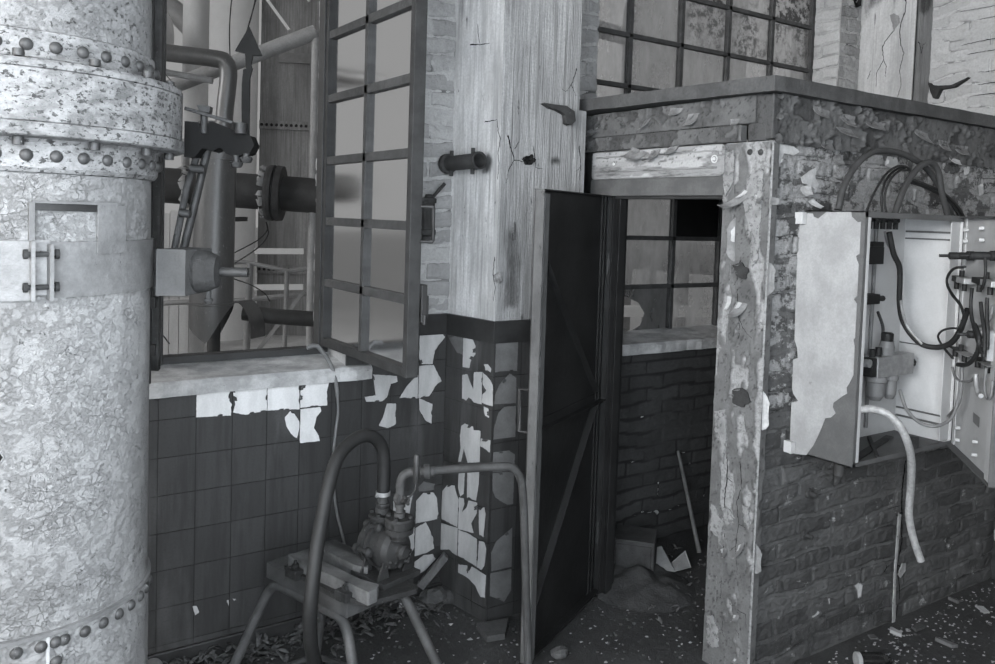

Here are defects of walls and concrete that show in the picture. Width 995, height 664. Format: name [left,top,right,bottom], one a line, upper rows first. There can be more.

crack [867,0,924,97]
peeling [813,106,886,138]
peeling [779,144,799,163]
peeling [885,156,898,168]
peeling [914,129,970,175]
peeling [800,168,824,208]
peeling [724,296,747,317]
peeling [196,383,329,443]
peeling [714,387,770,464]
peeling [365,334,518,602]
peeling [710,504,750,559]
peeling [706,615,719,648]